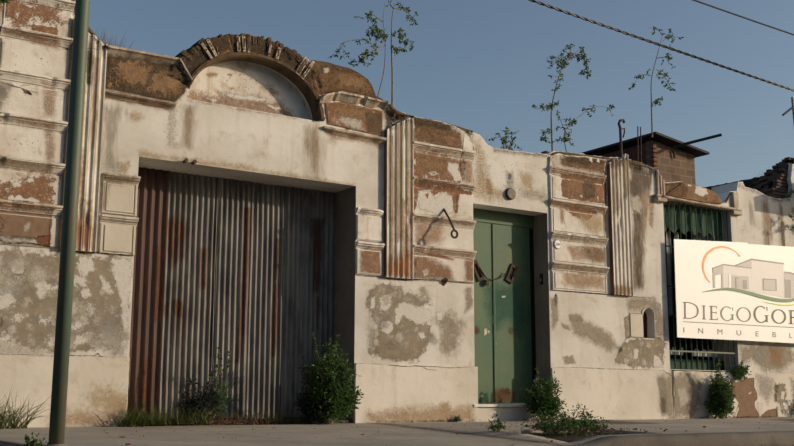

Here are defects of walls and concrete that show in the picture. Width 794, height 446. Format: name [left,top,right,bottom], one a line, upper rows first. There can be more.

peeling [0,0,74,76]
damp [88,30,374,208]
peeling [414,144,472,216]
flaking render [561,173,607,204]
damp [665,183,722,204]
peeling [0,169,62,355]
peeling [70,252,132,357]
rust [156,220,184,319]
rust [237,208,250,361]
peeling [366,283,443,362]
damp [552,155,664,336]
flaking render [730,378,787,418]